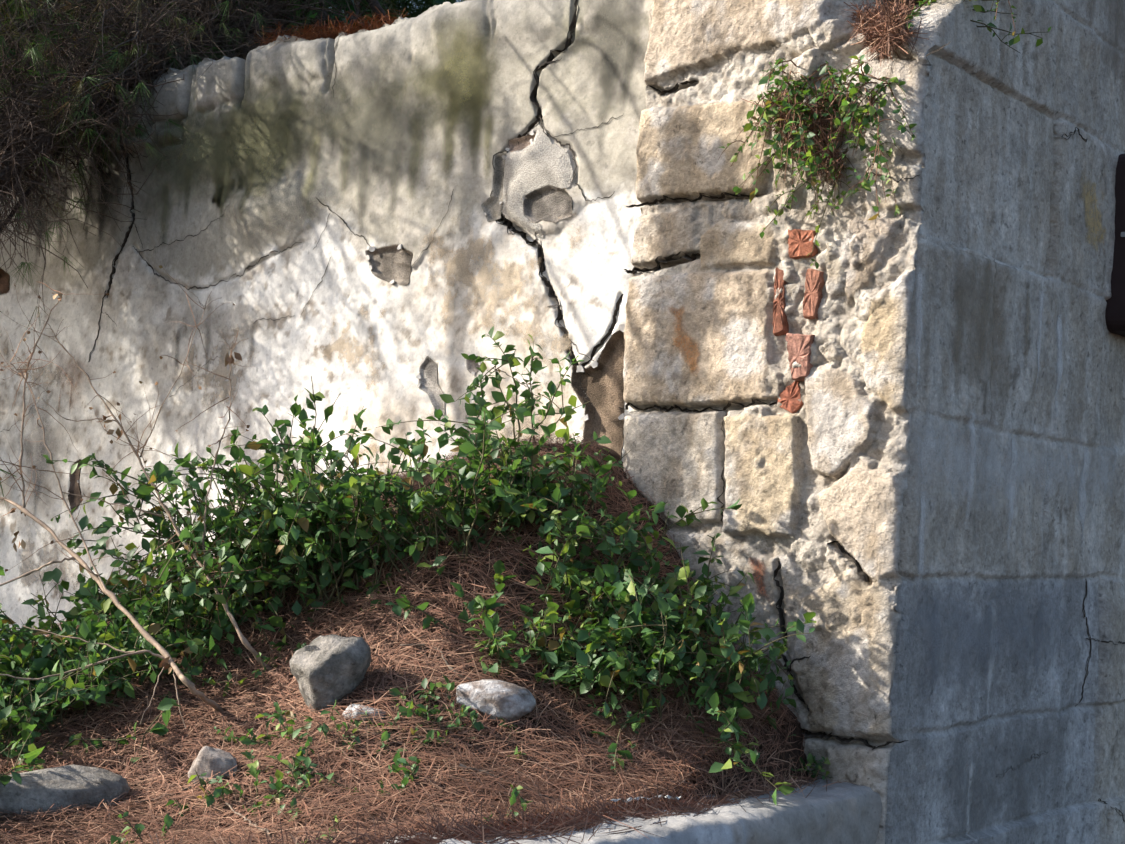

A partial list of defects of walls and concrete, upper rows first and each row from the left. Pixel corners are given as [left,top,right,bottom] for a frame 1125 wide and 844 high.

water stain [590,0,633,120]
crack [89,139,371,362]
water stain [341,111,420,204]
spalling [365,244,413,285]
crack [411,189,454,267]
water stain [445,103,455,170]
water stain [472,105,491,169]
spalling [523,184,581,248]
crack [490,0,758,376]
spalling [416,356,445,416]
spalling [558,324,625,459]
spalling [67,459,82,514]